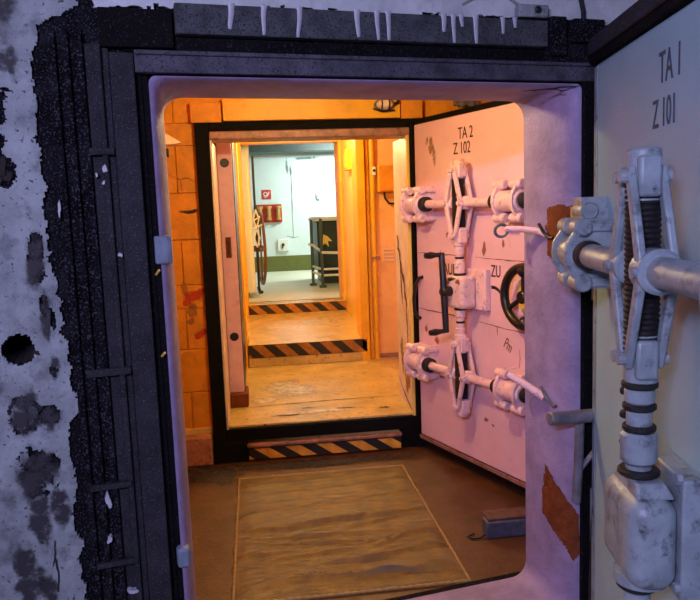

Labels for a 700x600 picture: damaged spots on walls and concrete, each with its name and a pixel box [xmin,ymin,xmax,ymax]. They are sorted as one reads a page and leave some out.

corrosion [545,204,573,258]
damp [26,236,44,285]
damp [40,299,50,340]
hole [2,334,40,364]
damp [10,392,60,435]
damp [16,452,71,546]
corrosion [542,464,580,561]
damp [12,549,58,600]